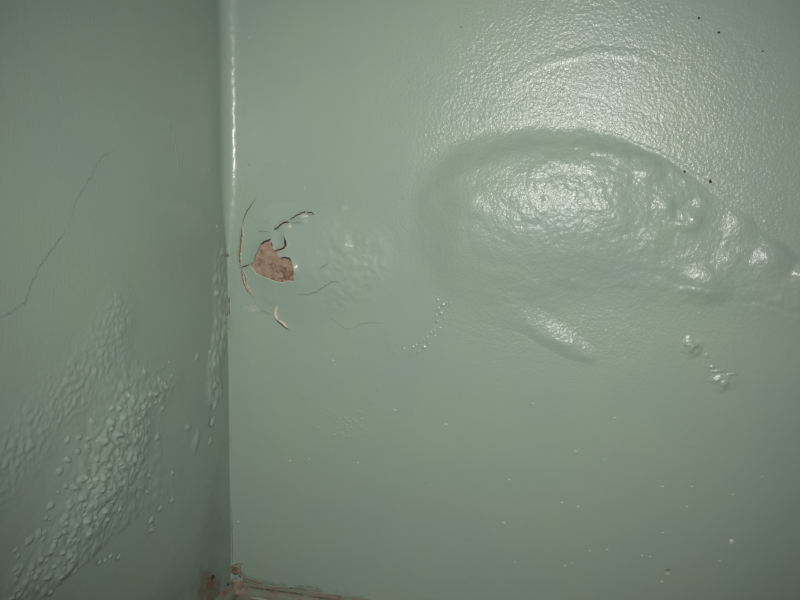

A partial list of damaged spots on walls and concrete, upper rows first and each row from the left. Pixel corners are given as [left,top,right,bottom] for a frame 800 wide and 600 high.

peeling [250,237,294,283]